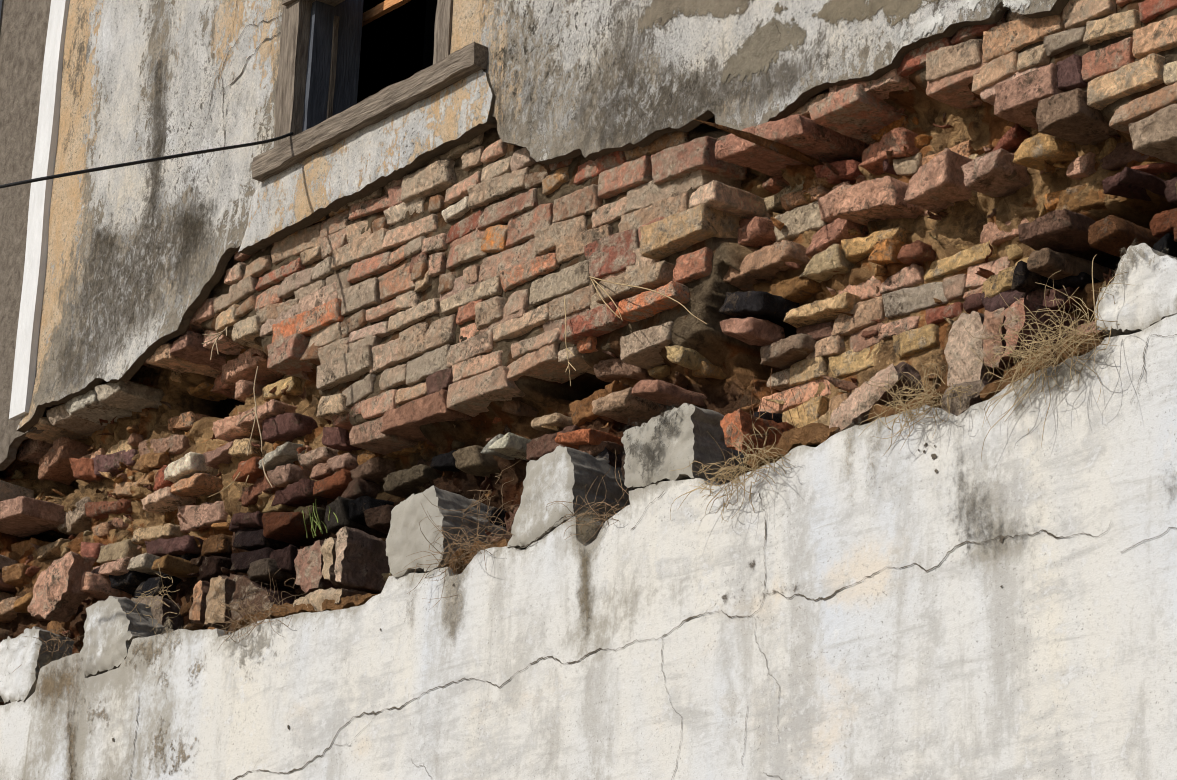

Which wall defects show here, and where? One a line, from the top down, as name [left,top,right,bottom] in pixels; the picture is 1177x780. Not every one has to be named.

peeling [637,0,1035,85]
water stain [180,202,210,251]
spalling [691,104,1177,370]
spalling [740,398,785,423]
spalling [820,375,858,393]
crack [1131,334,1177,400]
spalling [0,330,727,687]
water stain [577,512,596,628]
water stain [445,580,462,639]
crack [233,491,1177,780]
peeling [147,718,196,776]